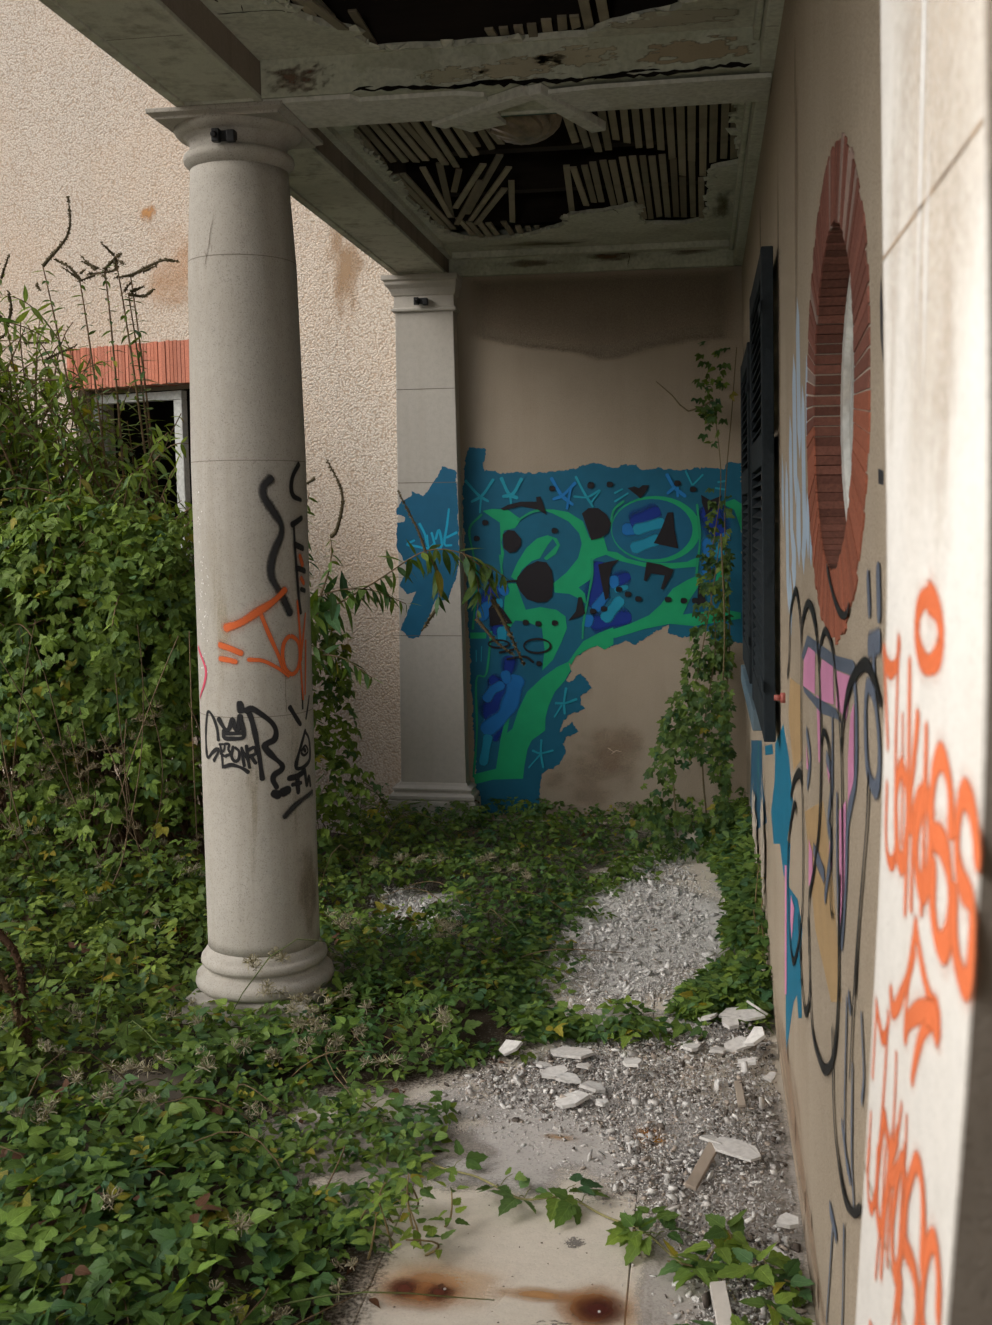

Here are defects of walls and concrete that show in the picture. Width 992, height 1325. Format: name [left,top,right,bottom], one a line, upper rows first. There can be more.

flaking render [341,25,410,52]
flaking render [432,0,698,133]
peeling [638,35,754,67]
flaking render [511,204,684,239]
rust [390,1272,464,1305]
rust [515,1290,619,1325]